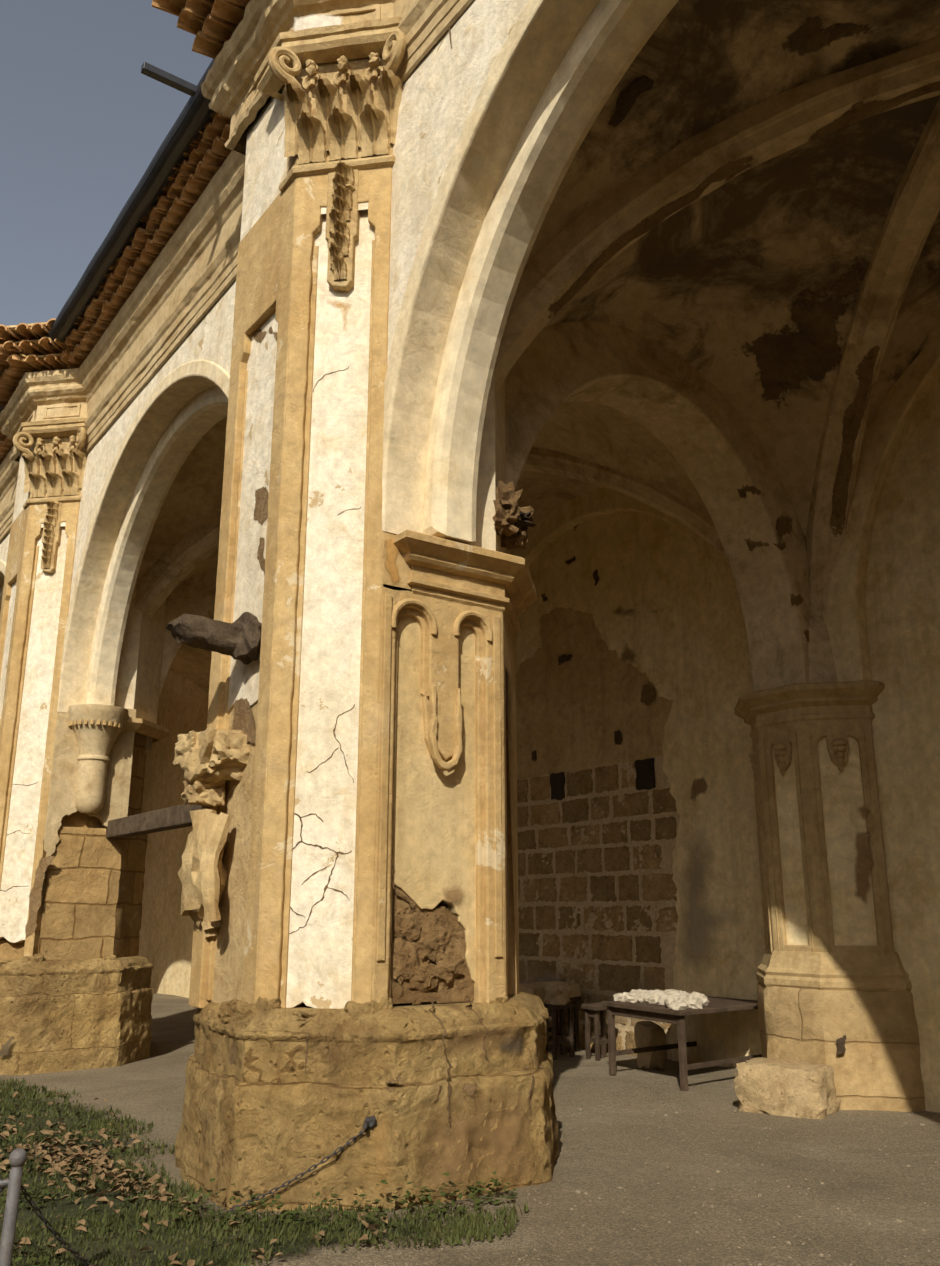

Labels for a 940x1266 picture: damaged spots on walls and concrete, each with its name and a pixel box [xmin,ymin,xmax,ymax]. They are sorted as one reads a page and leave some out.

crack [306,704,355,783]
flaking render [25,827,148,960]
crack [289,813,351,934]
spalling [390,885,474,1005]
flaking render [516,593,680,1060]
water stain [856,833,873,902]